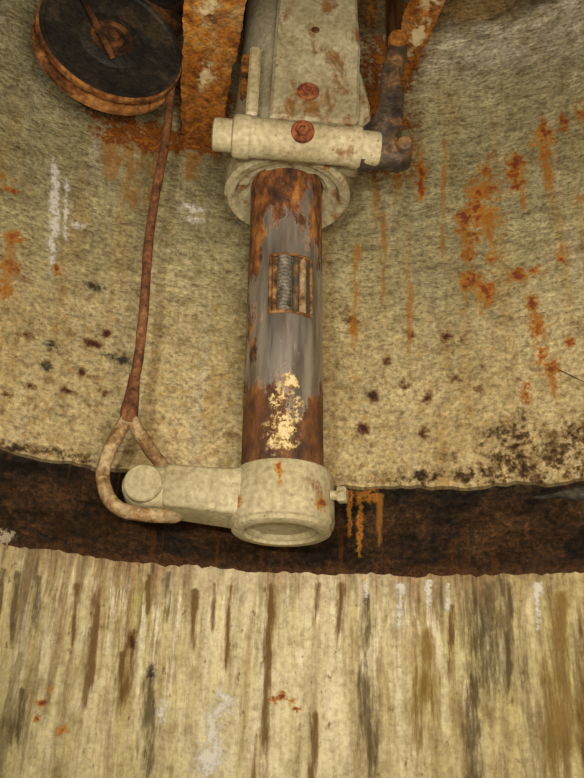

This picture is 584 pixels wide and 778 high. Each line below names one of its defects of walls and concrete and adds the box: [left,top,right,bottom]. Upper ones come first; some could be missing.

rust [83,106,222,158]
rust [505,152,526,192]
rust [530,102,584,167]
rust [452,162,504,308]
rust [525,292,560,388]
rust [347,489,378,555]
leakage [83,587,100,708]
leakage [119,629,135,711]
leakage [142,664,168,778]
leakage [256,584,275,758]
leakage [308,712,318,778]
leakage [466,581,513,778]